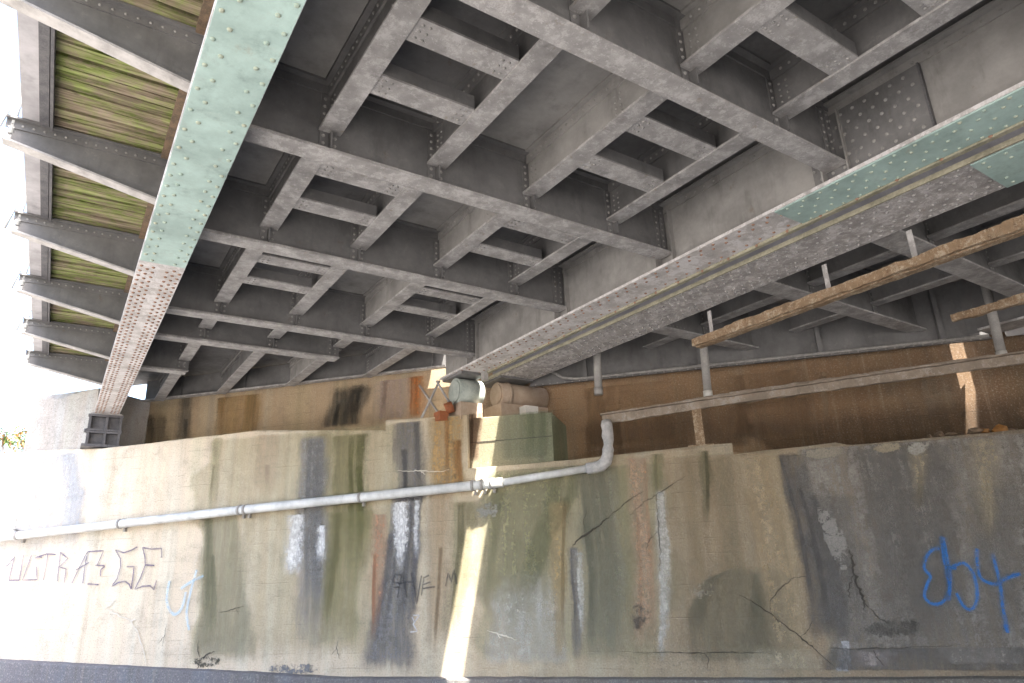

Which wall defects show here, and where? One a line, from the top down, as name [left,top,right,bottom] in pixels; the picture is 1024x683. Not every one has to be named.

damp [325,388,368,426]
rust [411,376,422,415]
crack [573,476,685,570]
spalling [816,507,849,570]
damp [780,427,1024,670]
crack [739,550,961,667]